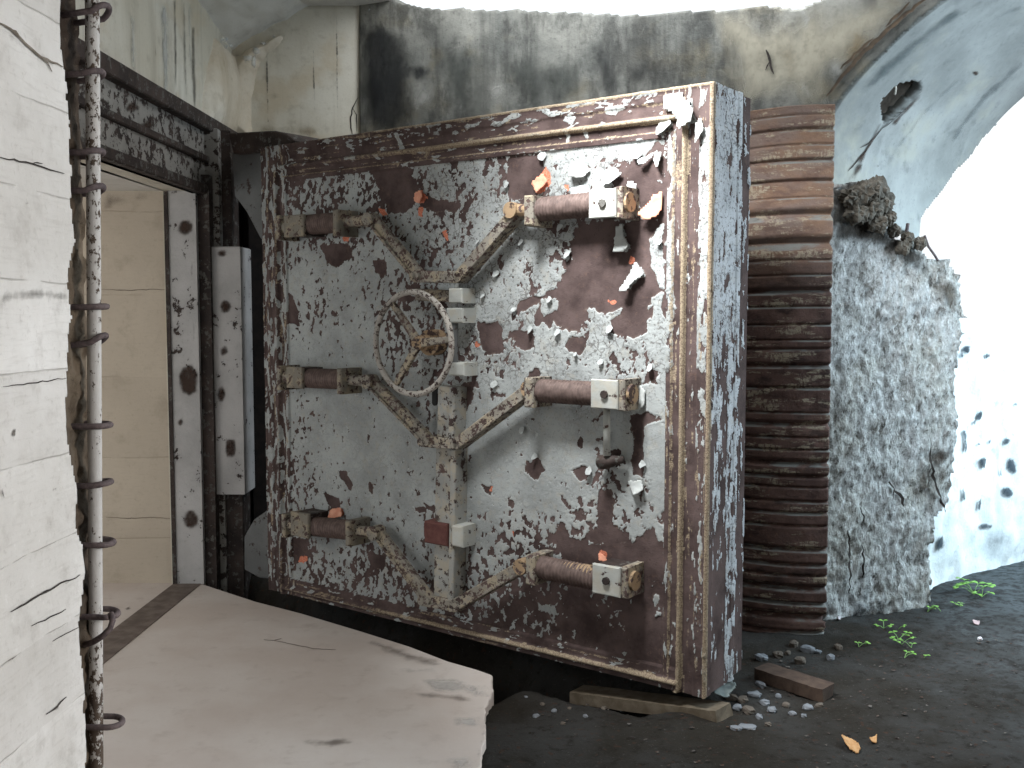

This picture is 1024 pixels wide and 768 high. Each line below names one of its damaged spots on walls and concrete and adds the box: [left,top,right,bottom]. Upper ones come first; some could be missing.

crack [0,23,63,71]
water stain [366,28,427,129]
peeling [656,92,704,143]
crack [0,157,64,174]
peeling [568,161,636,194]
corrosion [179,221,192,234]
peeling [613,192,662,252]
spalling [837,174,927,264]
peeling [619,263,643,291]
corrosion [179,366,197,395]
crack [928,448,946,512]
crack [11,575,80,641]